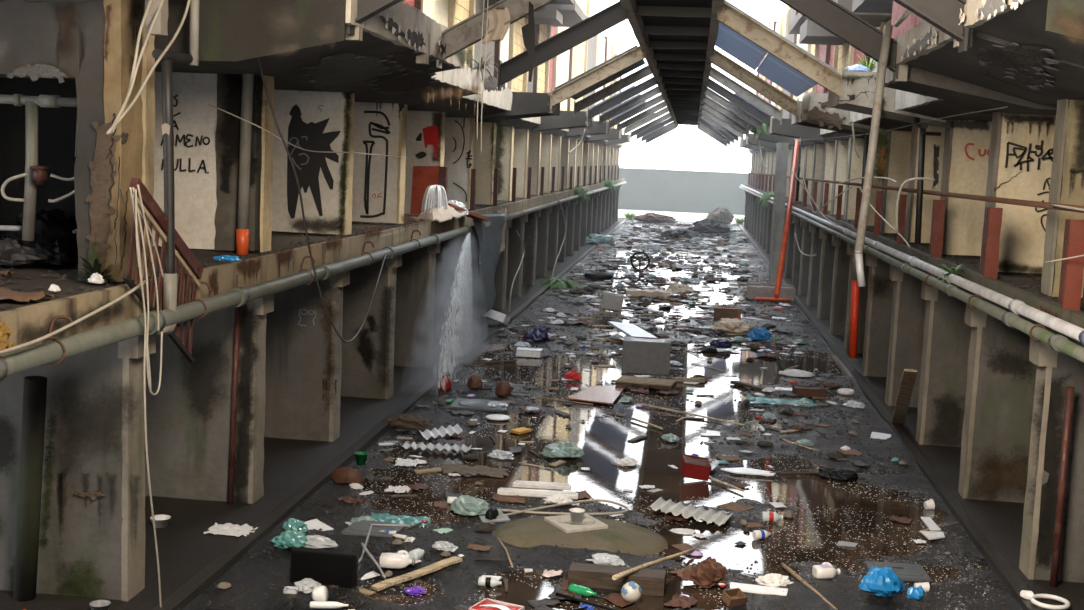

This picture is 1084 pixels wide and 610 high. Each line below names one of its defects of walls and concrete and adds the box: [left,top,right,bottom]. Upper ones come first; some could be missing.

peeling [959,0,1024,25]
water stain [1069,104,1084,190]
spalling [85,121,129,274]